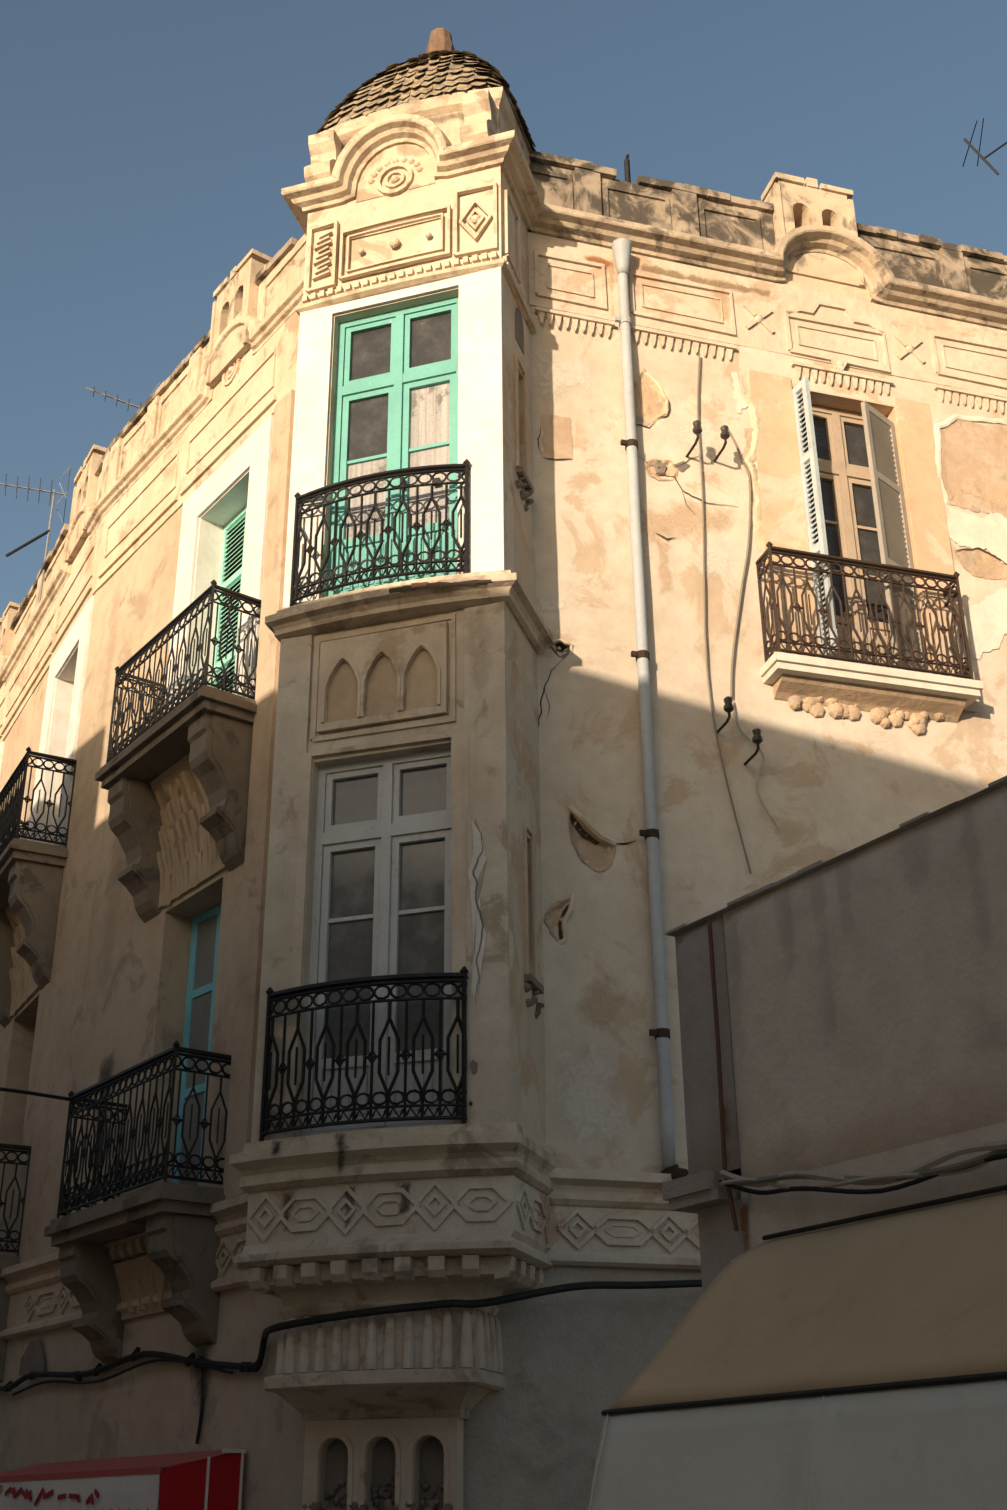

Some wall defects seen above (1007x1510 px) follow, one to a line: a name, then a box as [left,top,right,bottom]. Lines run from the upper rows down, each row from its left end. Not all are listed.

spalling [634,369,716,481]
peeling [934,414,1007,659]
spalling [567,804,636,873]
spalling [544,892,576,945]